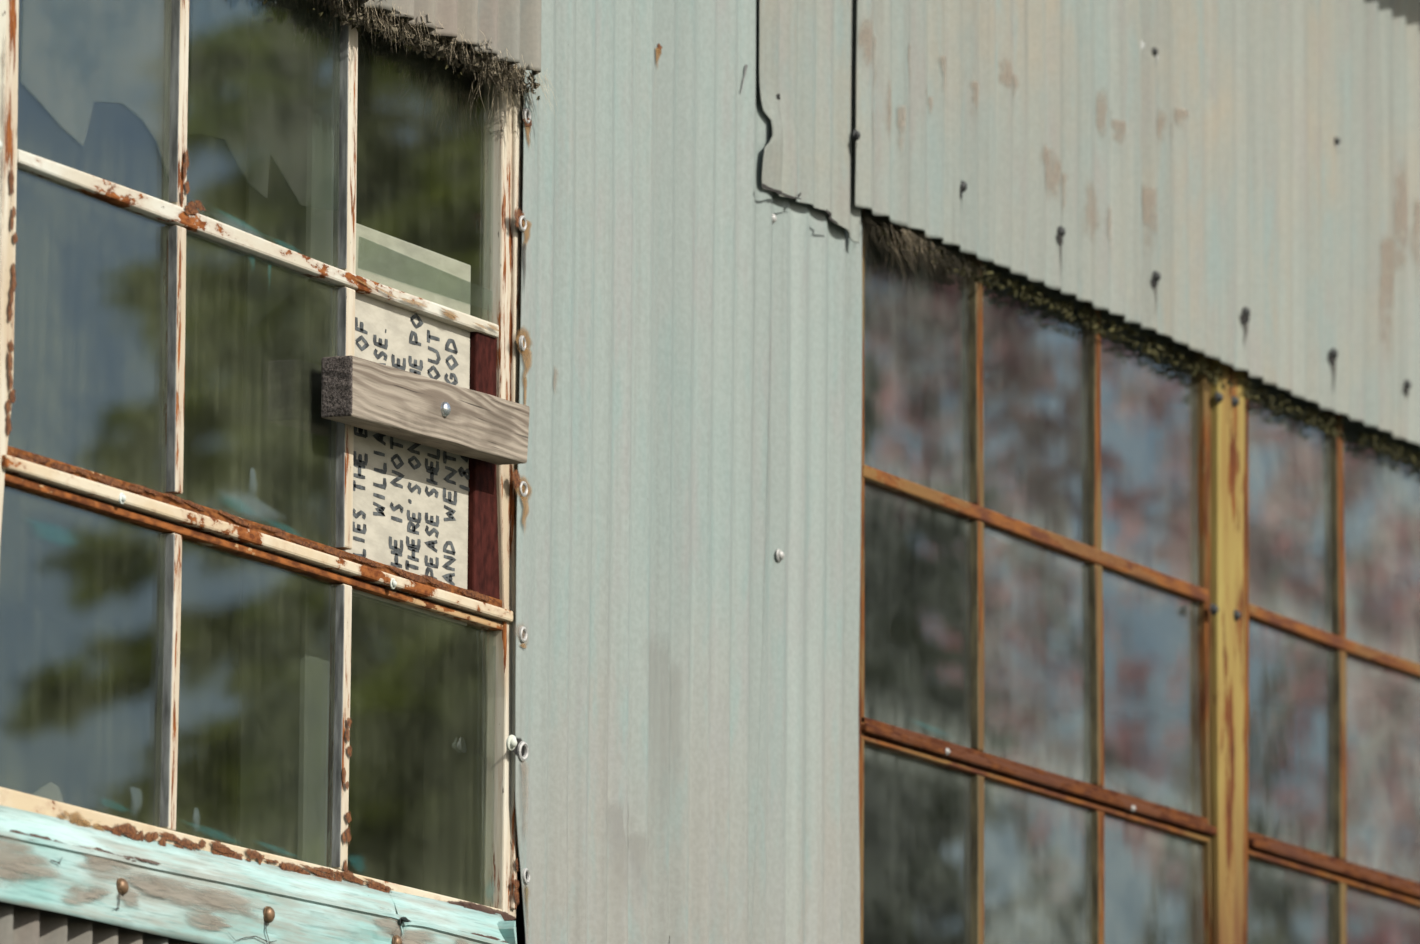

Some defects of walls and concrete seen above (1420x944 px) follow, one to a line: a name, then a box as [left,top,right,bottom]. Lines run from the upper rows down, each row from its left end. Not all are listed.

rust [9,169,18,245]
rust [180,150,206,215]
rust [8,263,17,322]
rust [6,340,16,435]
rust [18,453,492,601]
peeling [0,830,253,930]